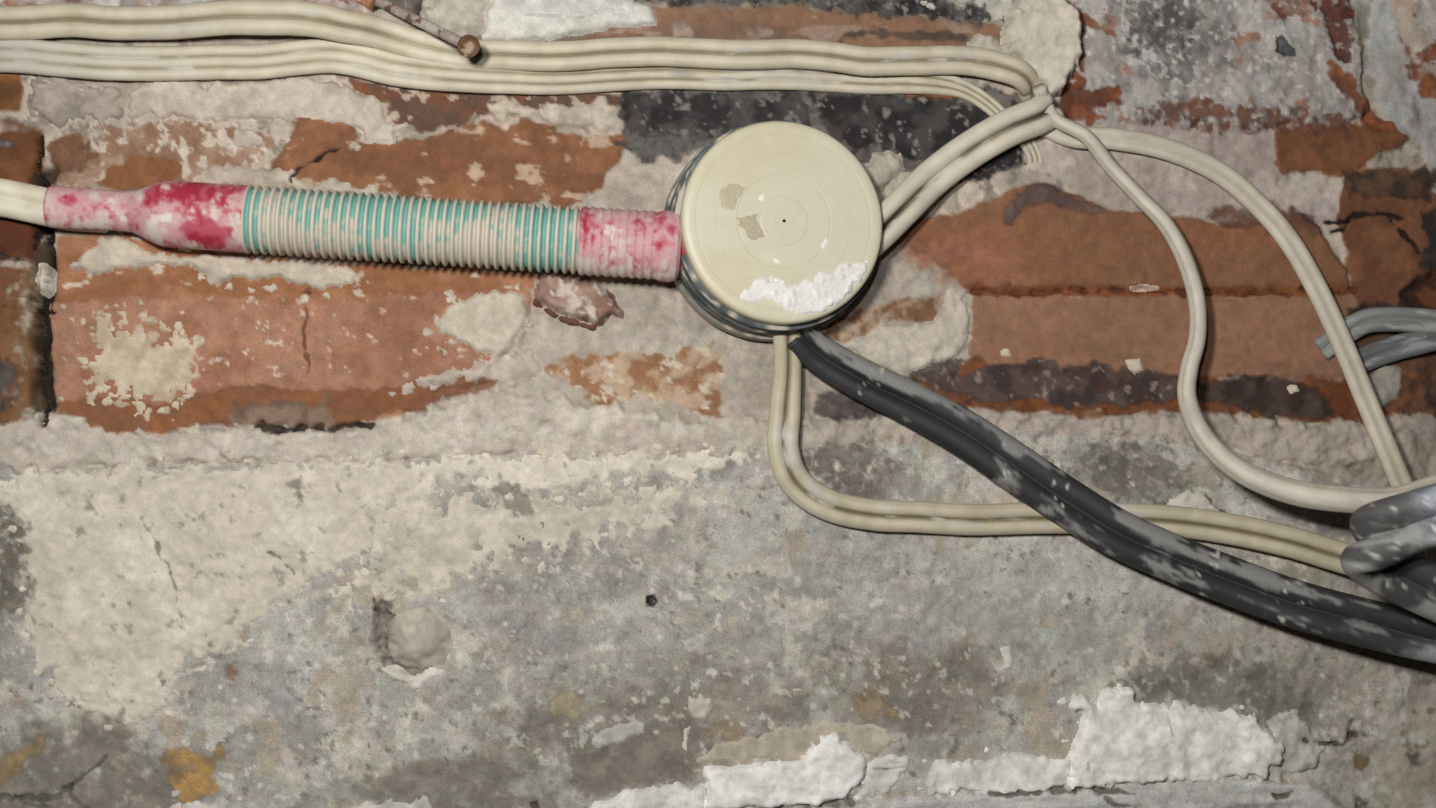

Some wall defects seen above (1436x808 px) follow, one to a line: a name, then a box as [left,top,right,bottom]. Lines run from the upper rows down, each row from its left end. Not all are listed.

peeling [233,118,292,149]
flaking render [47,135,97,172]
peeling [225,282,278,293]
peeling [300,292,330,303]
peeling [444,289,456,305]
peeling [515,269,624,331]
peeling [137,310,203,342]
peeling [102,396,130,408]
peeling [157,397,186,414]
flaking render [435,377,496,399]
leakage [570,717,703,795]
crack [0,755,107,808]